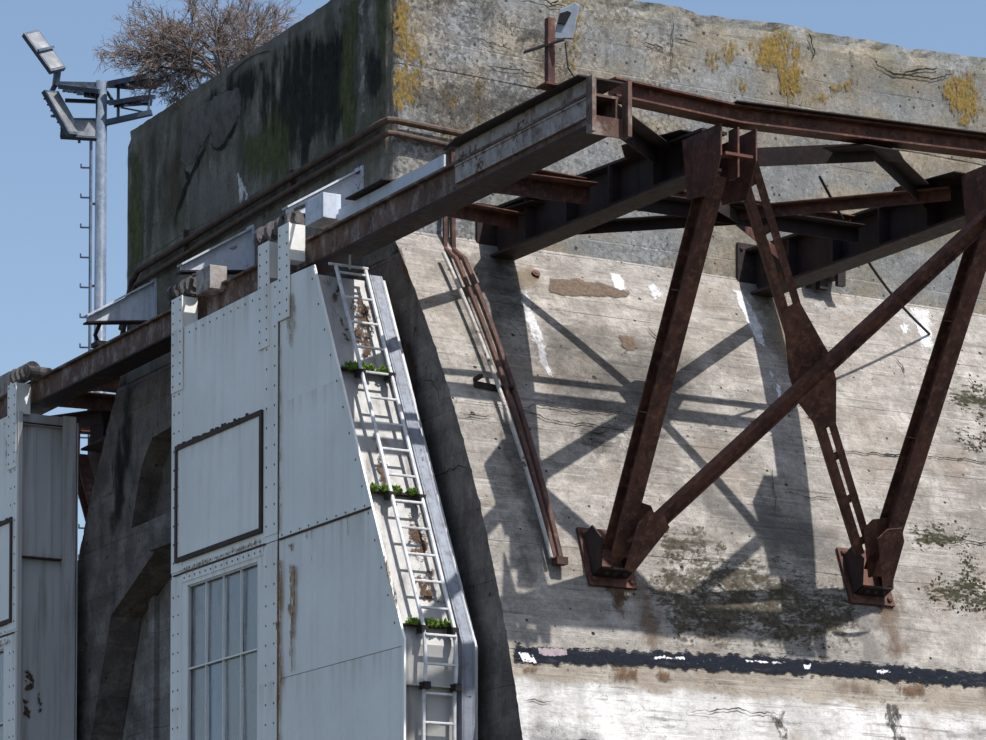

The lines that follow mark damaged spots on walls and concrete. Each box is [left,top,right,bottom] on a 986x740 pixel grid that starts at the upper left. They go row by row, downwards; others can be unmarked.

water stain [209,0,388,177]
crack [864,54,955,80]
rust [278,294,295,462]
rust [275,560,296,740]
crack [689,707,780,716]